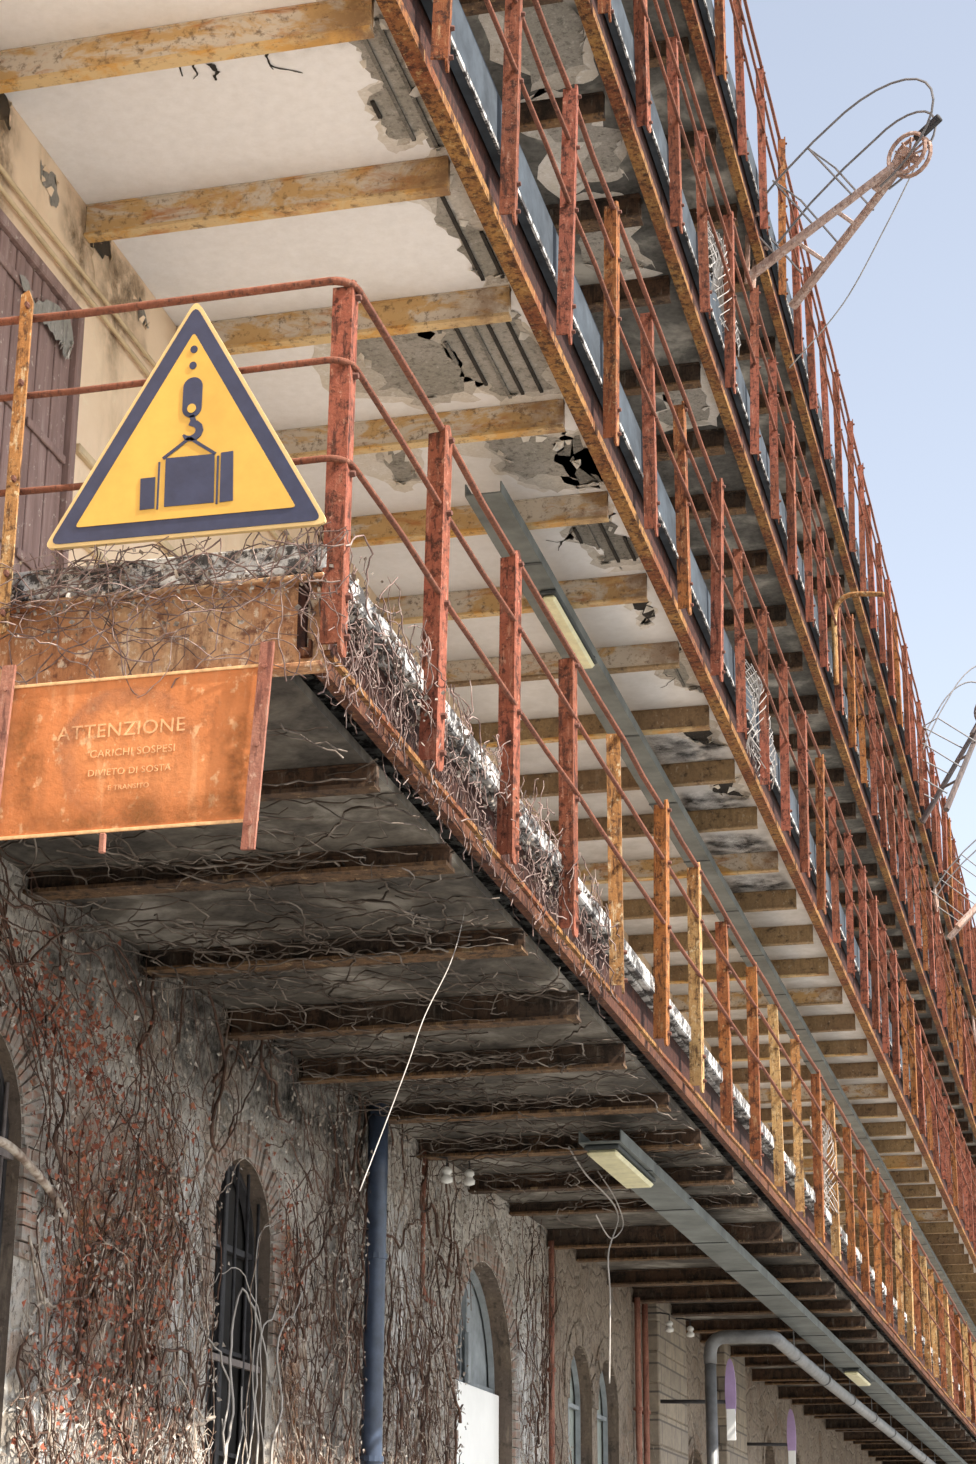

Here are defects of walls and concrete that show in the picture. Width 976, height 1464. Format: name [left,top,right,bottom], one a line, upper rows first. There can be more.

crack [179,63,220,81]
crack [265,54,302,73]
flaking render [349,0,513,290]
flaking render [312,343,331,392]
flaking render [355,310,566,413]
flaking render [353,448,424,493]
flaking render [455,429,645,574]